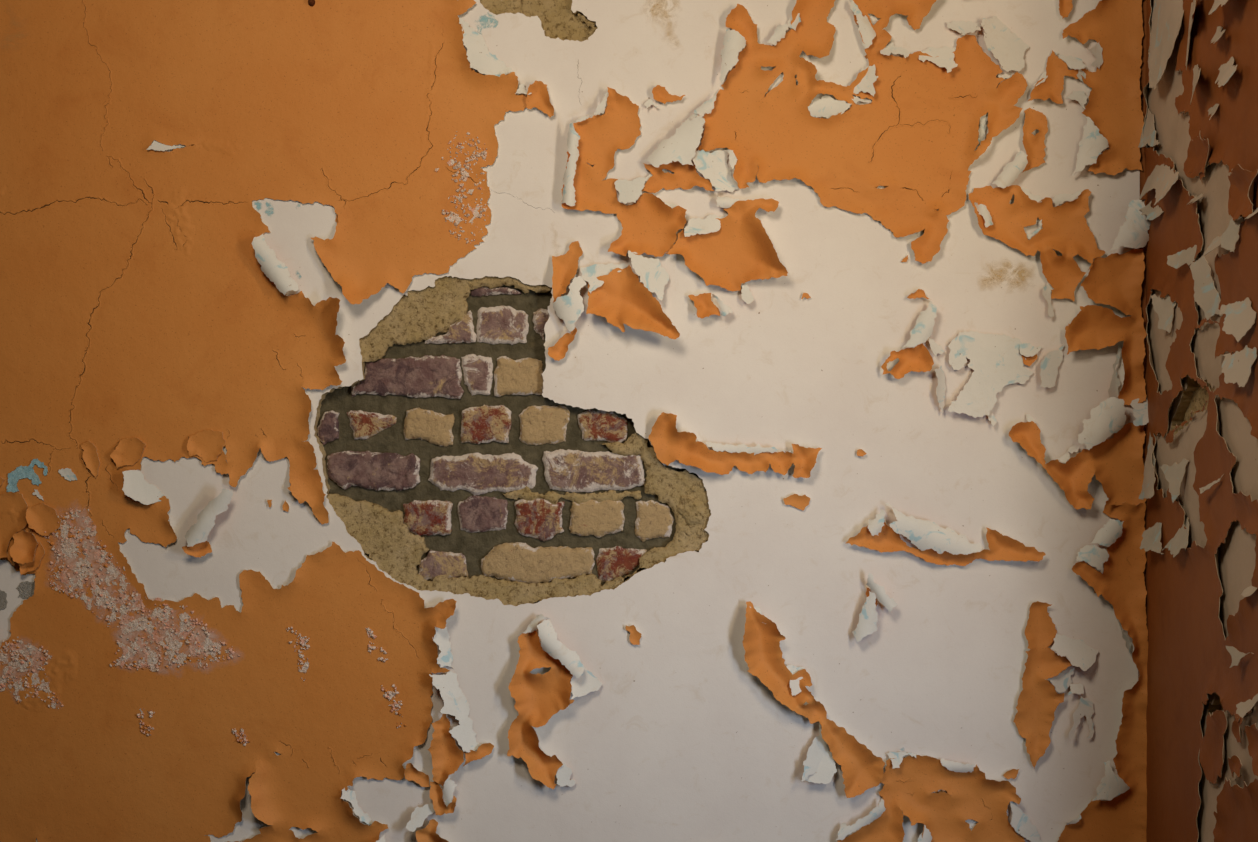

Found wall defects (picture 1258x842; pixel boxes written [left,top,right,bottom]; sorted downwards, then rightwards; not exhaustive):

peeling [1150,17,1258,299]
crack [0,0,246,538]
peeling [252,0,1150,842]
peeling [1152,302,1183,392]
peeling [1157,313,1258,546]
peeling [0,489,62,647]
leakage [43,507,240,672]
peeling [119,451,382,612]
peeling [1224,522,1256,619]
leakage [0,636,64,709]
peeling [208,794,266,842]
peeling [1202,702,1258,842]